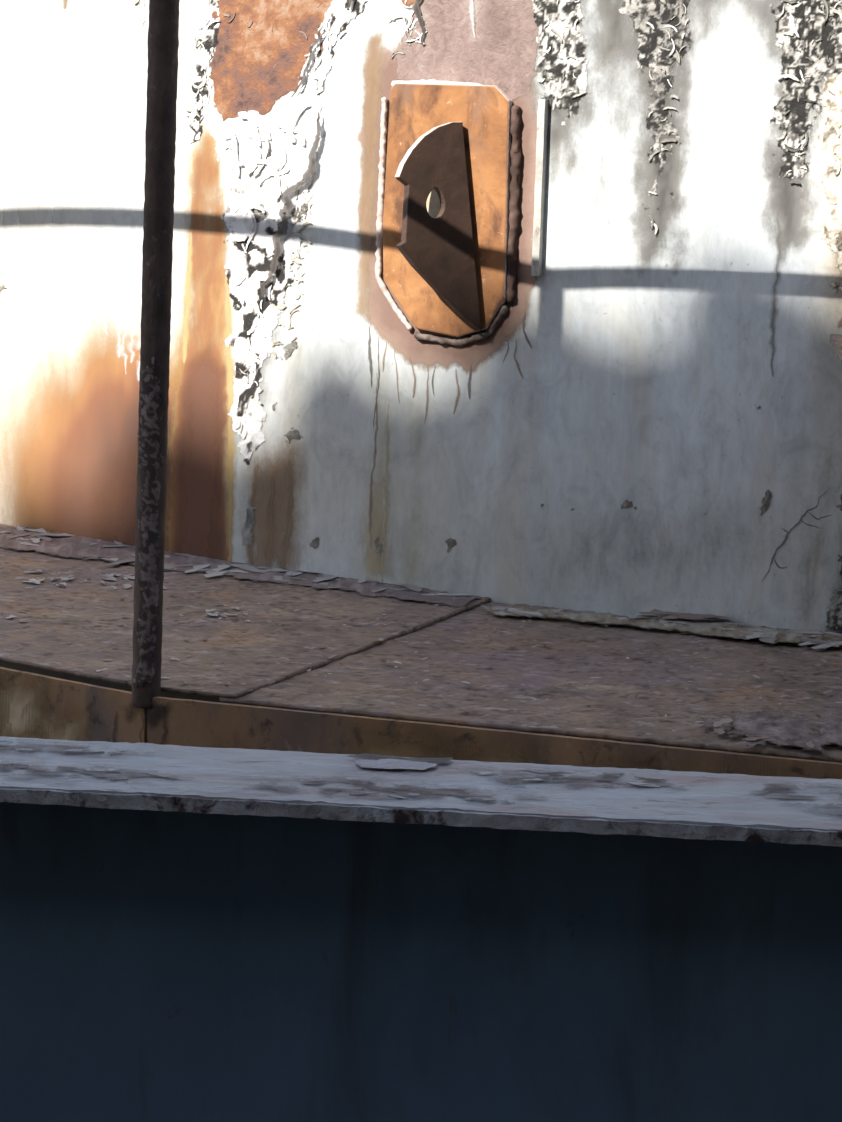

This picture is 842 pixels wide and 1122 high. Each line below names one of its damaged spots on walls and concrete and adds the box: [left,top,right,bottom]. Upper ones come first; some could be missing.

rust [3,335,141,546]
rust [164,134,235,561]
peeling [185,0,368,465]
peeling [0,356,842,688]
peeling [387,0,721,264]
peeling [741,0,842,375]
crack [762,491,831,581]
rust [0,683,84,741]
spalling [695,697,842,751]